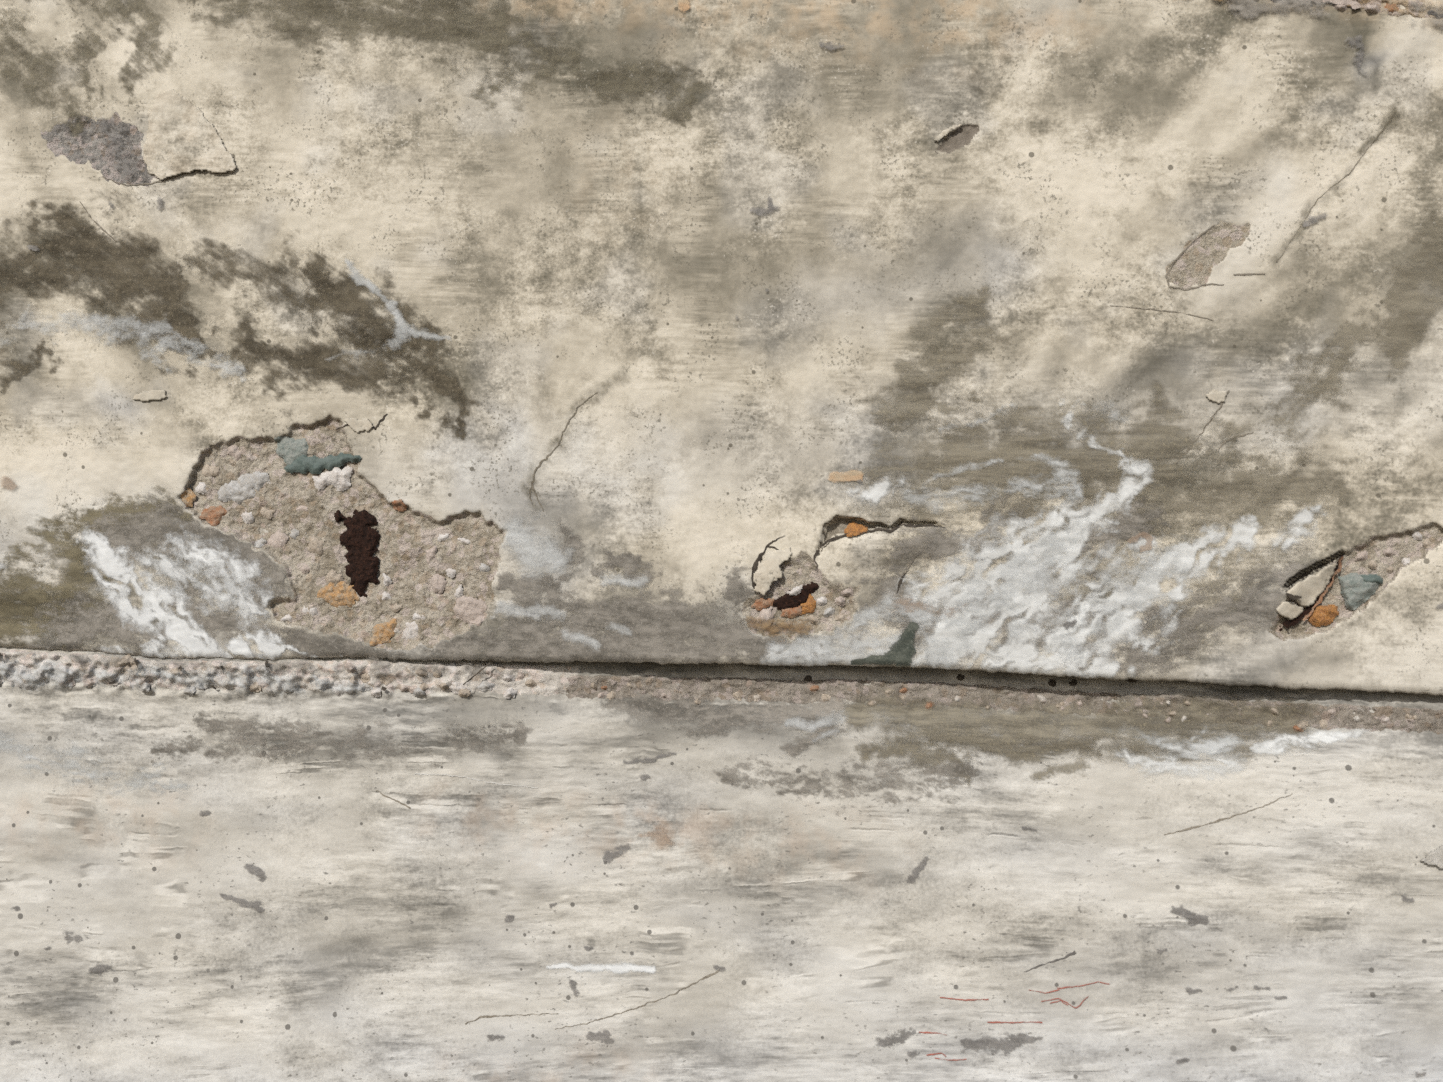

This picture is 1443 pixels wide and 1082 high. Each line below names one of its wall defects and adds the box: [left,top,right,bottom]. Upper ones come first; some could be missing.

damp [0,20,105,135]
damp [79,0,170,90]
damp [208,0,710,126]
crack [1219,0,1443,29]
spalling [41,112,159,187]
damp [0,201,478,439]
damp [426,211,1443,677]
damp [0,487,404,659]
spalling [0,414,1443,735]